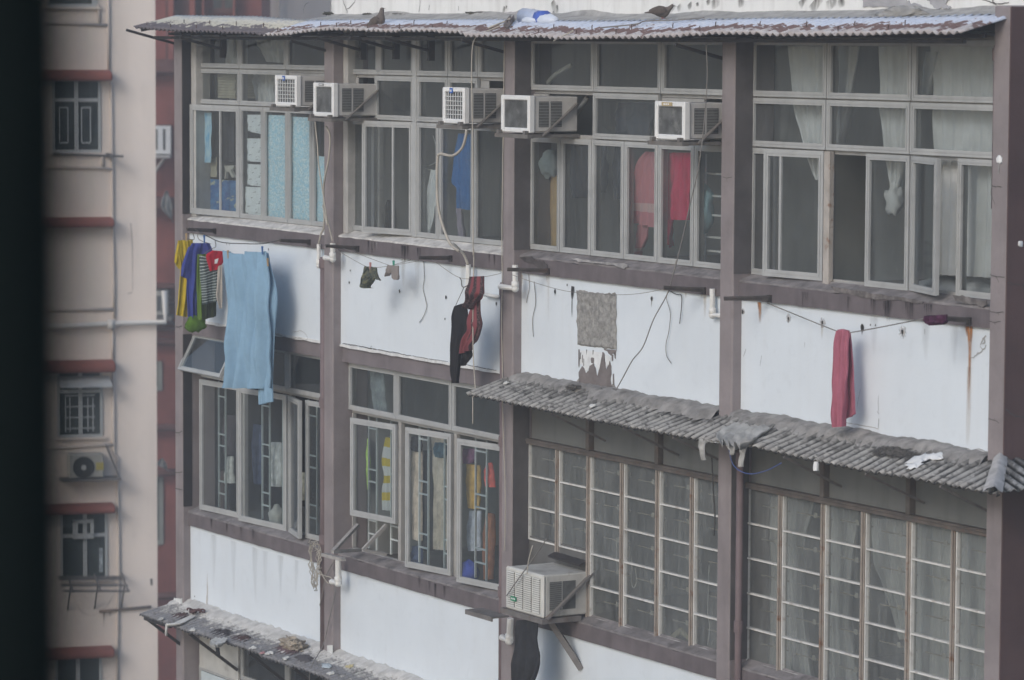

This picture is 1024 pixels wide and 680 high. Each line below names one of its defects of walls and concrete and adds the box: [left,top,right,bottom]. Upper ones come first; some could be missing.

peeling [577,349,616,387]